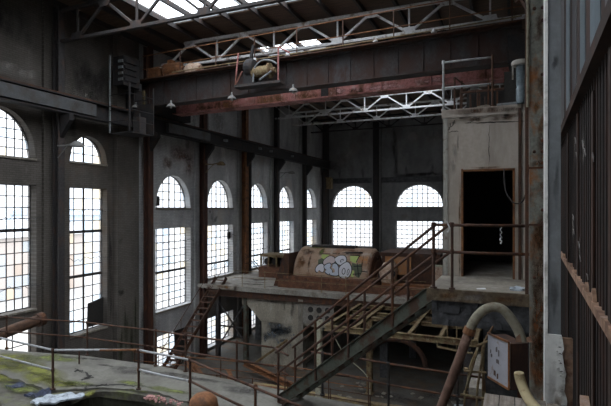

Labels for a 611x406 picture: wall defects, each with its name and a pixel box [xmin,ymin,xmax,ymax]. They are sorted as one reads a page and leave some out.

crack [448,120,518,160]
corrosion [534,119,544,166]
corrosion [532,222,544,387]